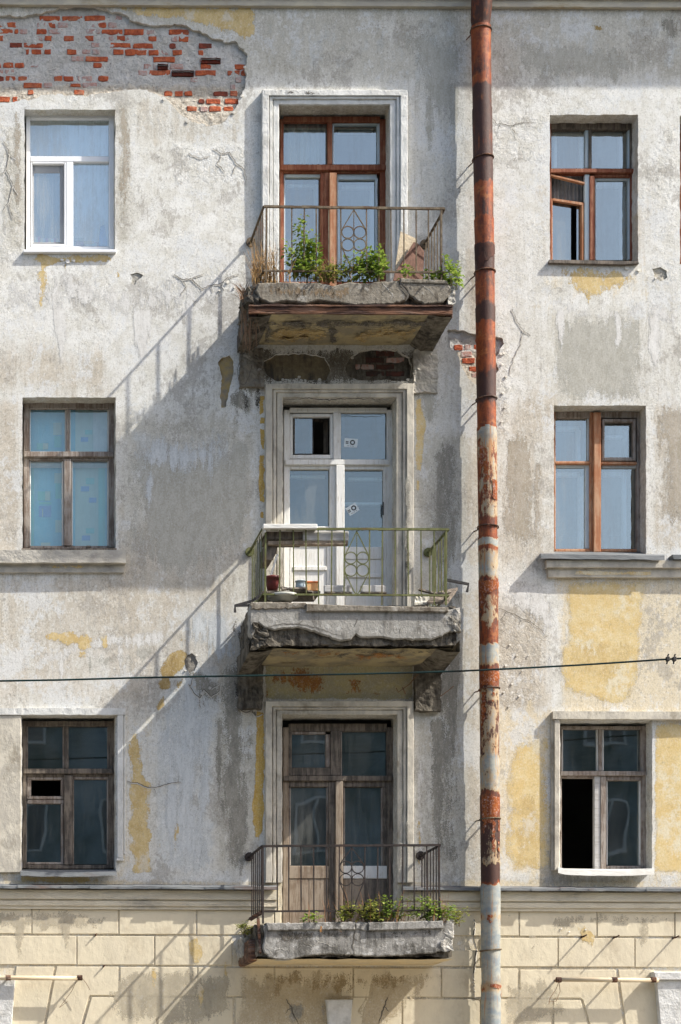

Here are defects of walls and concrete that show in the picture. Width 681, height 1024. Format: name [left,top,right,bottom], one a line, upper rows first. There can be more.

flaking render [0,7,257,126]
crack [188,149,247,180]
corrosion [474,242,495,269]
crack [173,274,239,295]
flaking render [264,354,330,381]
flaking render [346,350,411,381]
flaking render [447,330,476,384]
corrosion [478,445,498,499]
peeling [570,642,632,682]
corrosion [480,670,500,730]
crack [127,781,181,795]
corrosion [482,795,500,852]